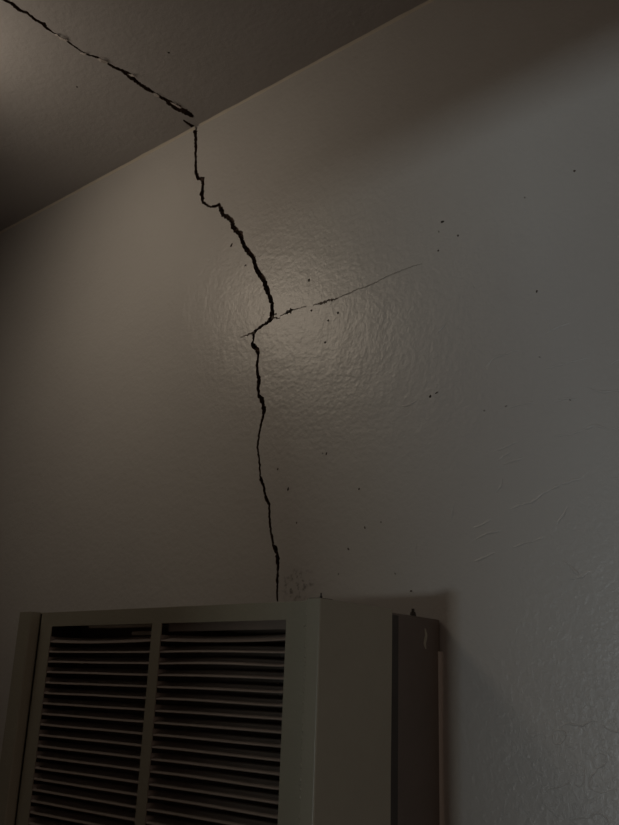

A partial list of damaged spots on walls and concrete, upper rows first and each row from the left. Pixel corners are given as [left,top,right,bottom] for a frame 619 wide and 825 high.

crack [3,0,420,601]